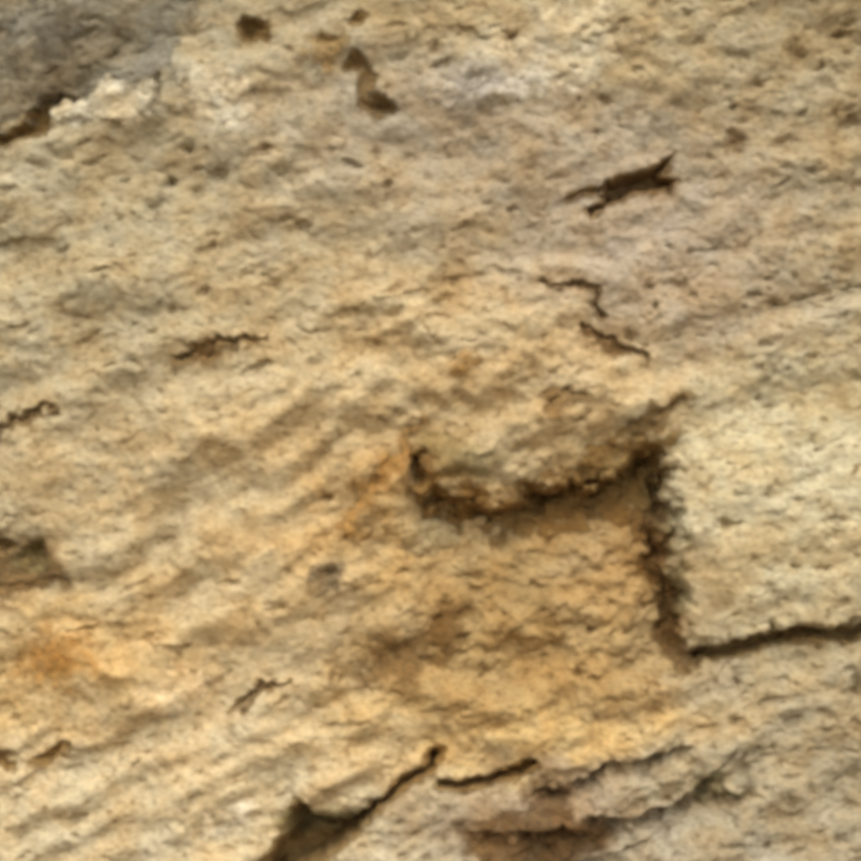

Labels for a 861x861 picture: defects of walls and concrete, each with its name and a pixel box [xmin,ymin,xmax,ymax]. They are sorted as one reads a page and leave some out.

damp [0,0,261,133]
spalling [302,471,691,733]
crack [640,466,861,675]
crack [258,742,542,861]